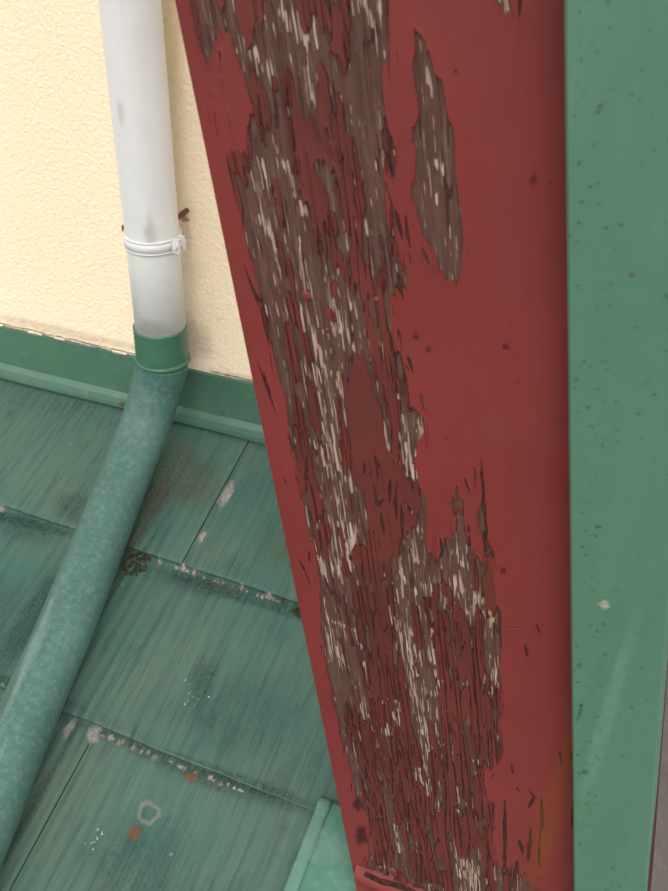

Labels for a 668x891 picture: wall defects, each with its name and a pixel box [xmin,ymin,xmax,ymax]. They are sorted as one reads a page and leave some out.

peeling [196,0,539,891]